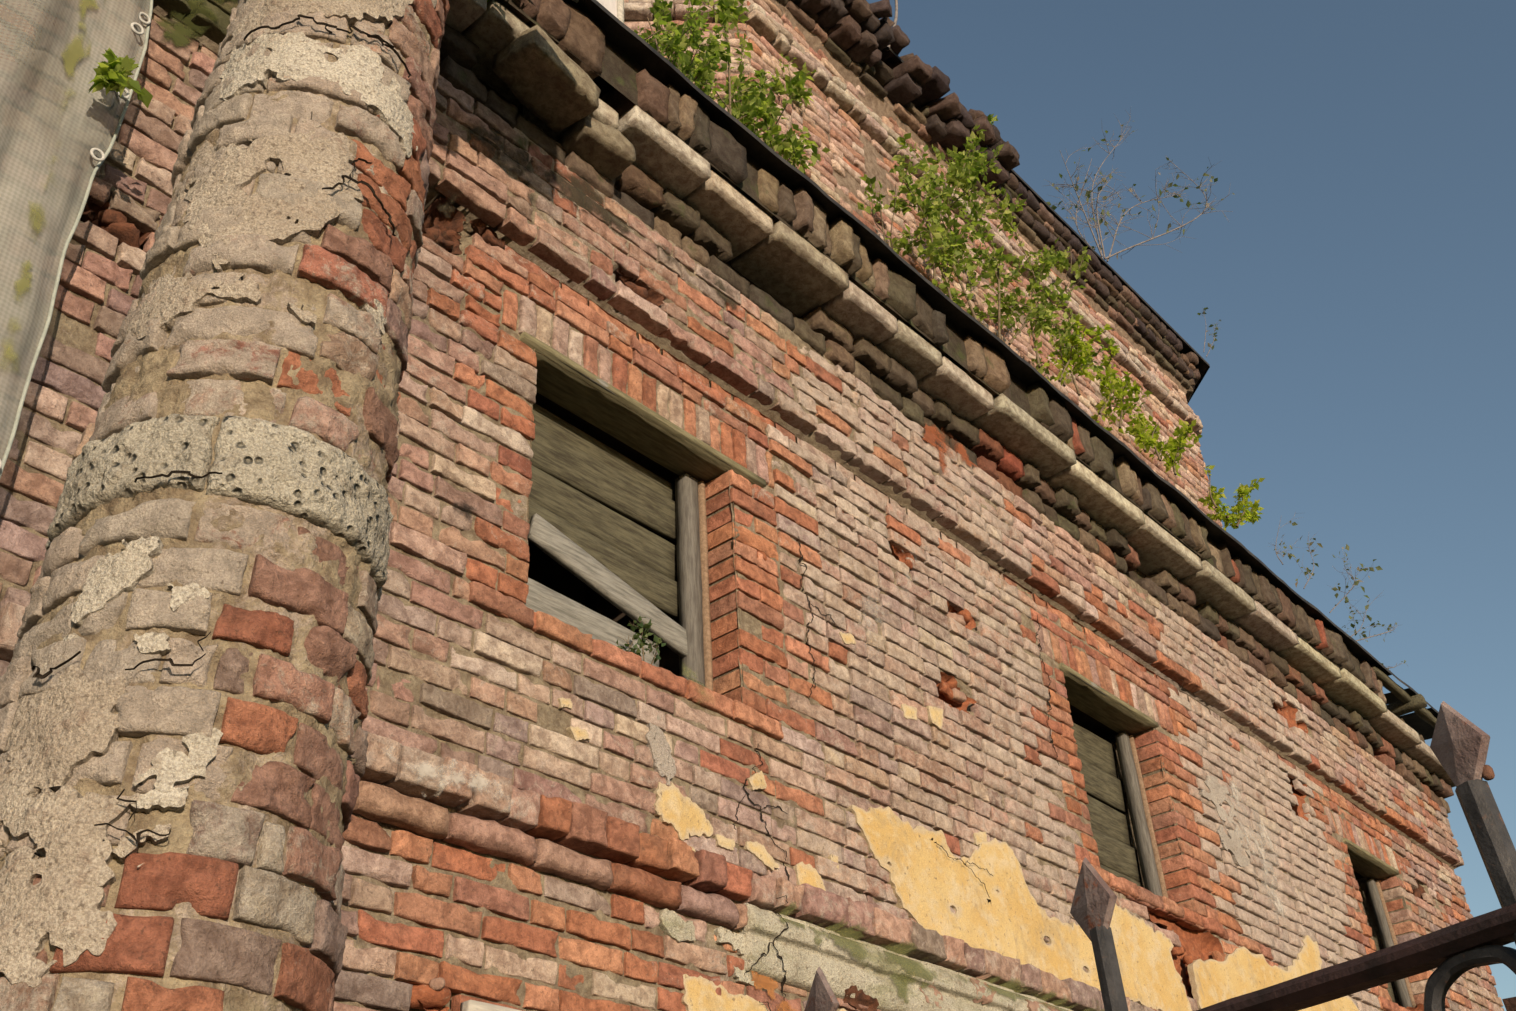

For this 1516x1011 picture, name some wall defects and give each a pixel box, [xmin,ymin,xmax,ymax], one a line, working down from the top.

crack [243,14,412,78]
crack [322,158,396,236]
crack [134,470,222,483]
peeling [167,582,210,612]
peeling [133,632,171,656]
spalling [936,672,976,714]
peeling [131,786,189,846]
spalling [1148,904,1224,999]
peeling [732,966,755,986]
flaking render [843,985,879,1011]
flaking render [970,974,997,1005]